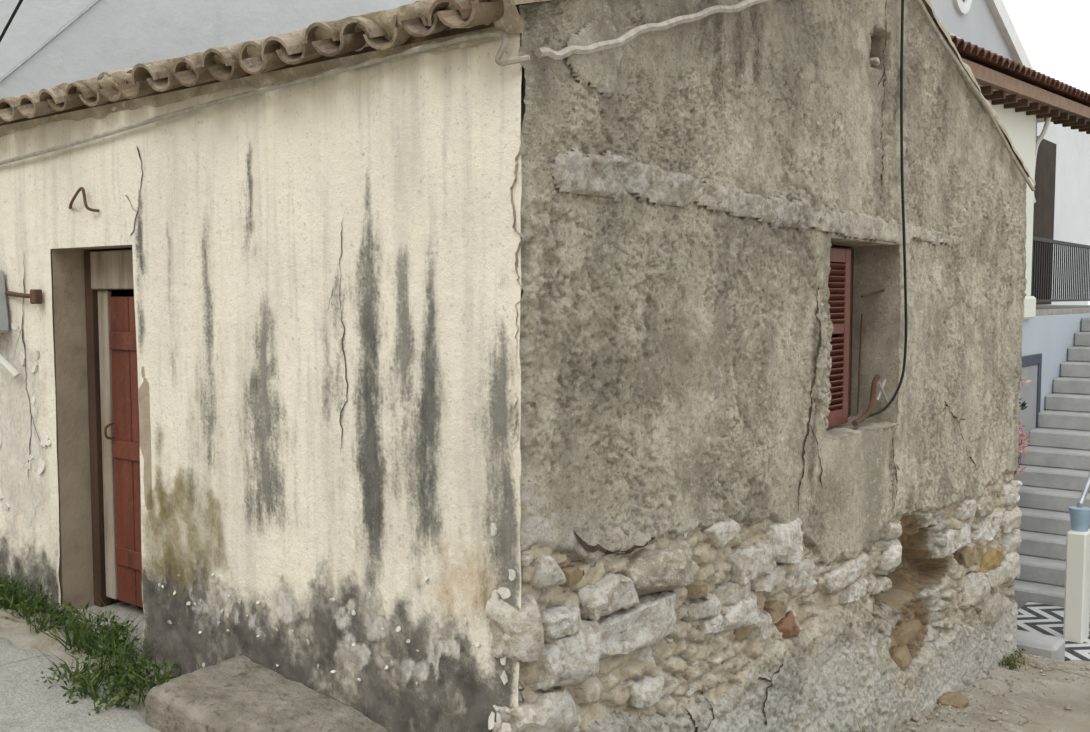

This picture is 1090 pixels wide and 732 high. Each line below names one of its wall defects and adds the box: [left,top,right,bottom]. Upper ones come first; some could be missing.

crack [798,286,823,511]
leakage [142,225,518,732]
leakage [0,537,58,612]
peeling [158,560,259,637]
peeling [256,573,295,632]
peeling [329,597,460,686]
flaking render [475,472,1022,732]